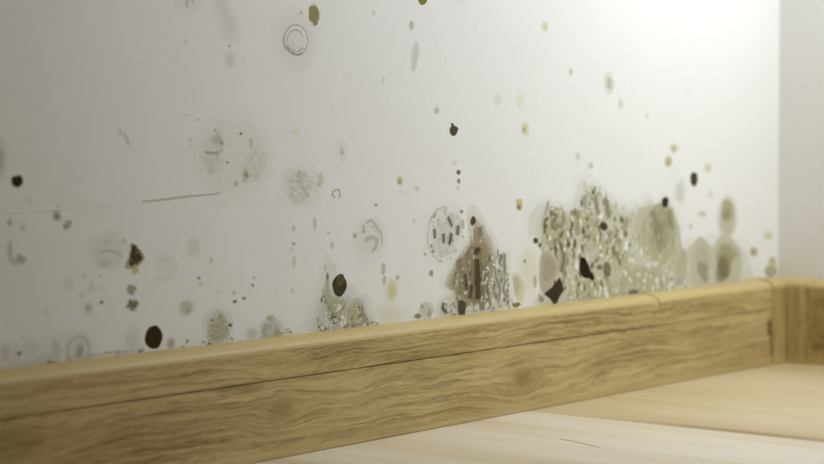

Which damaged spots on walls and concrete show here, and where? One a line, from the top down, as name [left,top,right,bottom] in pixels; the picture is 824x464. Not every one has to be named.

mould [0,133,23,188]
mould [52,205,72,230]
mould [60,228,145,315]
crack [143,192,221,202]
damp [183,107,276,208]
damp [244,143,778,340]
damp [0,285,189,369]
mould [177,289,246,345]